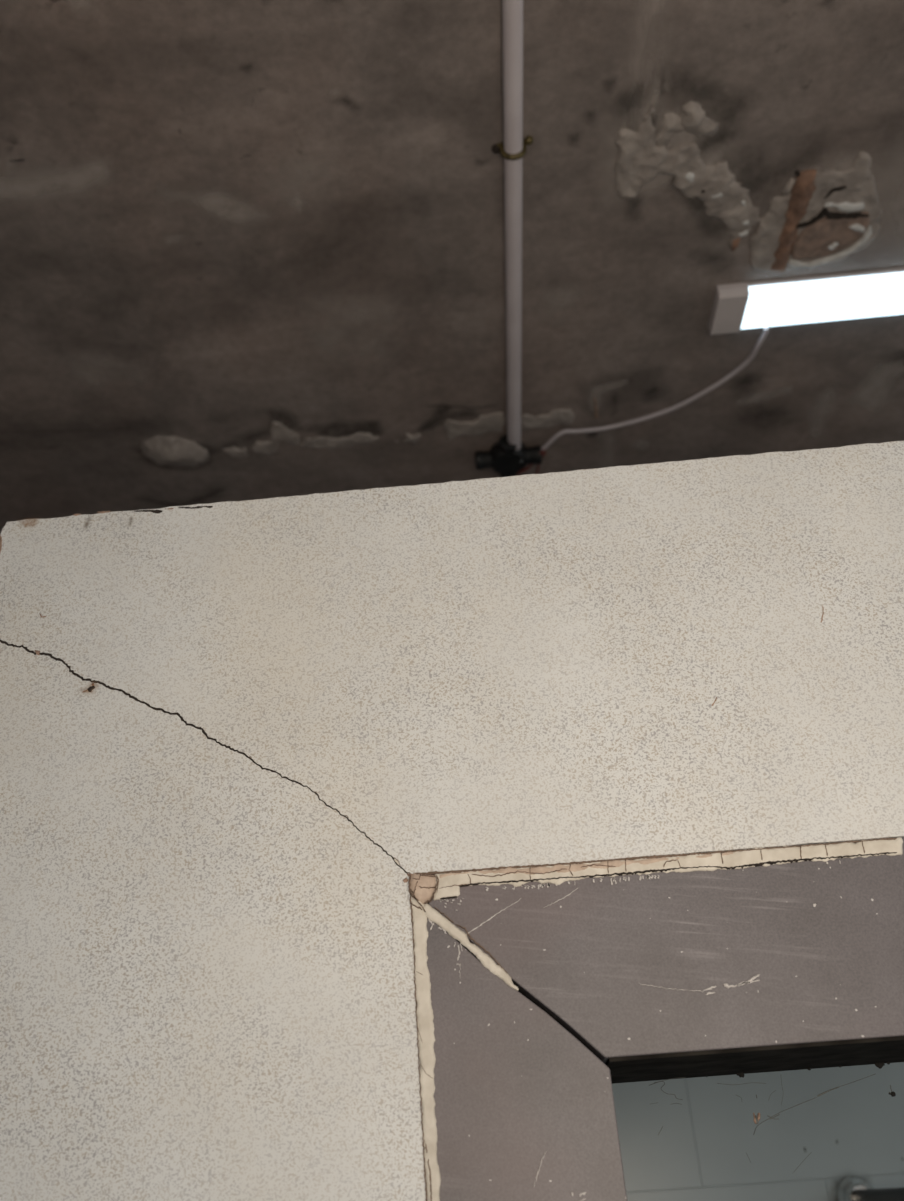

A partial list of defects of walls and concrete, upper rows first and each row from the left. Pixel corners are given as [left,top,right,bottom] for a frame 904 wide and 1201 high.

spalling [614,100,882,273]
flaking render [222,414,380,459]
flaking render [395,407,505,445]
flaking render [521,408,574,431]
crack [0,640,897,1201]